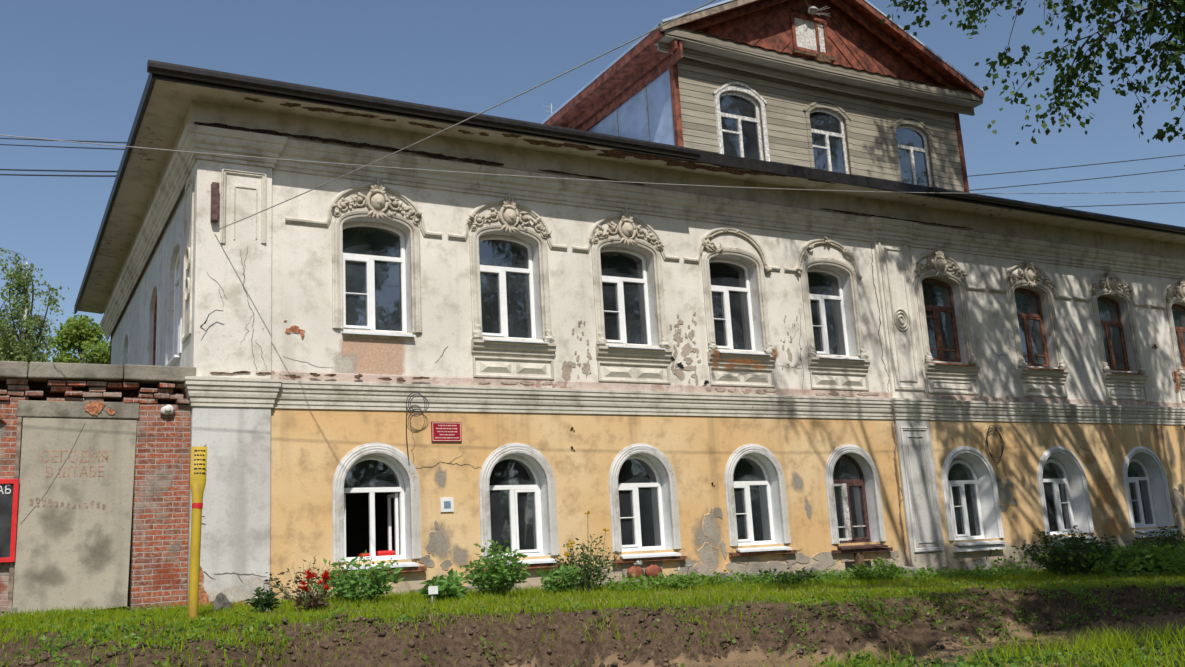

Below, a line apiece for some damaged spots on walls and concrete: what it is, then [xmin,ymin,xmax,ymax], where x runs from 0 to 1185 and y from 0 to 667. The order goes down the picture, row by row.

peeling [669,312,776,394]
spalling [198,566,214,607]